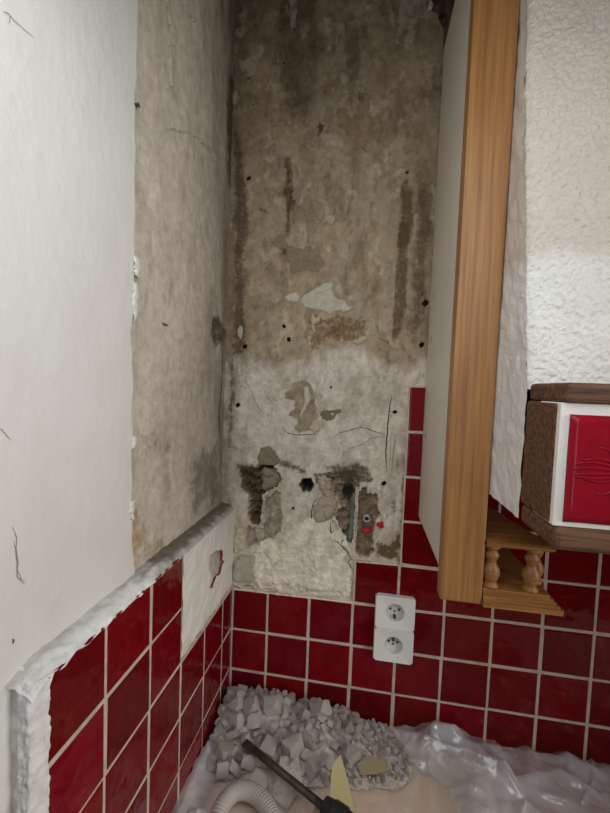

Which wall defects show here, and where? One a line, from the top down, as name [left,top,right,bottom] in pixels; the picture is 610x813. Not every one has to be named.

damp [228,77,248,354]
damp [283,159,295,217]
peeling [271,234,323,274]
damp [393,180,413,335]
damp [212,318,225,347]
spalling [285,281,368,352]
peeling [283,380,341,433]
crack [245,380,394,470]
spalling [237,446,285,552]
spalling [297,468,384,559]